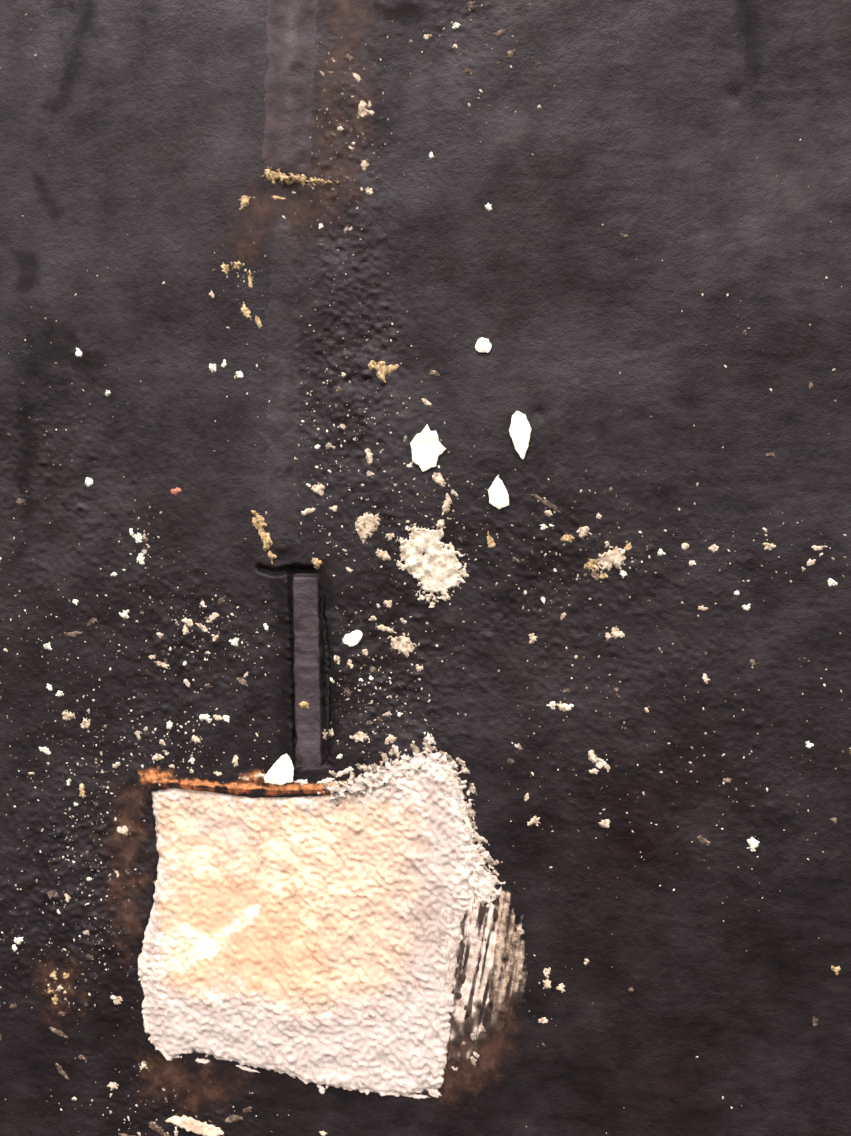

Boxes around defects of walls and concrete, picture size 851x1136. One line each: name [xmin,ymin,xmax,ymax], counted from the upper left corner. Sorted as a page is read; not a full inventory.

peeling [238,195,254,211]
peeling [209,245,263,299]
peeling [240,302,262,329]
peeling [701,530,764,611]
peeling [752,528,846,583]
crack [261,567,334,755]
spalling [0,308,705,1099]
corrosion [140,764,355,796]
peeling [747,836,759,858]